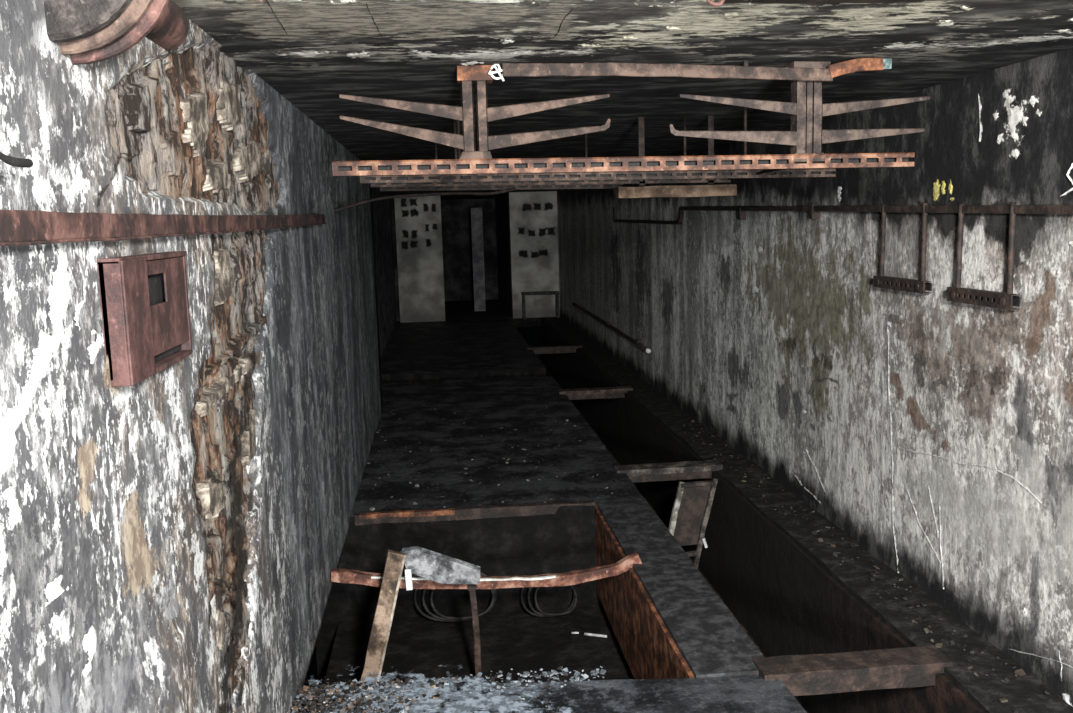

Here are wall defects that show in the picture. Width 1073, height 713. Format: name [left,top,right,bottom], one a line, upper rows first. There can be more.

water stain [208,0,586,46]
spalling [107,45,279,214]
peeling [993,89,1042,159]
rust [894,271,1059,425]
rust [889,372,952,452]
rust [1061,377,1073,408]
spalling [189,230,268,713]